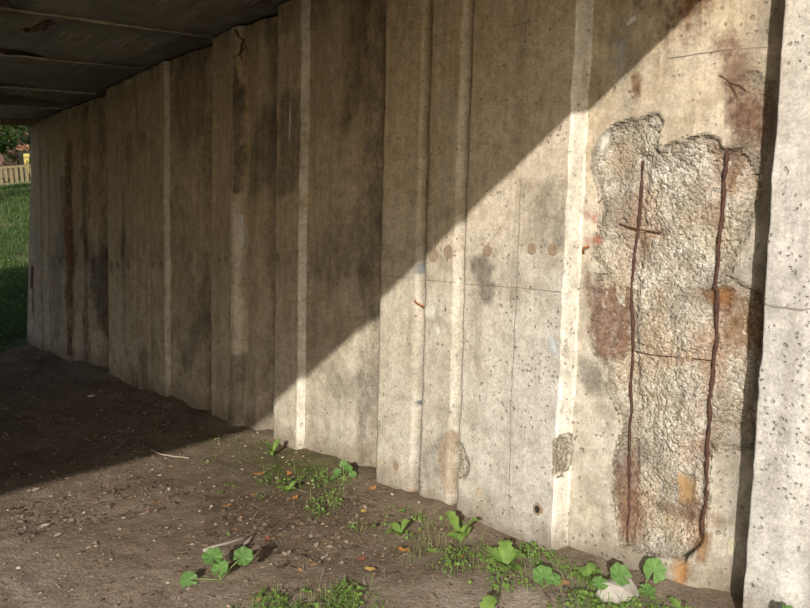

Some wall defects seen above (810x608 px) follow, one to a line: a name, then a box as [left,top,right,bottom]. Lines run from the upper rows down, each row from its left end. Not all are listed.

crack [235,29,248,63]
corrosion [65,142,88,355]
water stain [91,249,109,335]
corrosion [587,280,631,359]
spalling [590,112,765,562]
spalling [552,432,574,479]